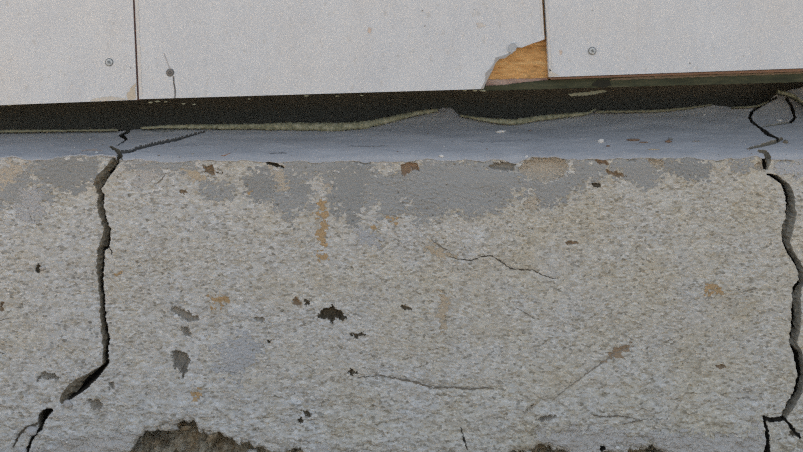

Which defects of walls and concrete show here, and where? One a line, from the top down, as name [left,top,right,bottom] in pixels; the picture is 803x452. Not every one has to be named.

crack [13,131,206,452]
spalling [129,420,269,452]
spalling [511,444,565,452]
crack [748,97,803,452]